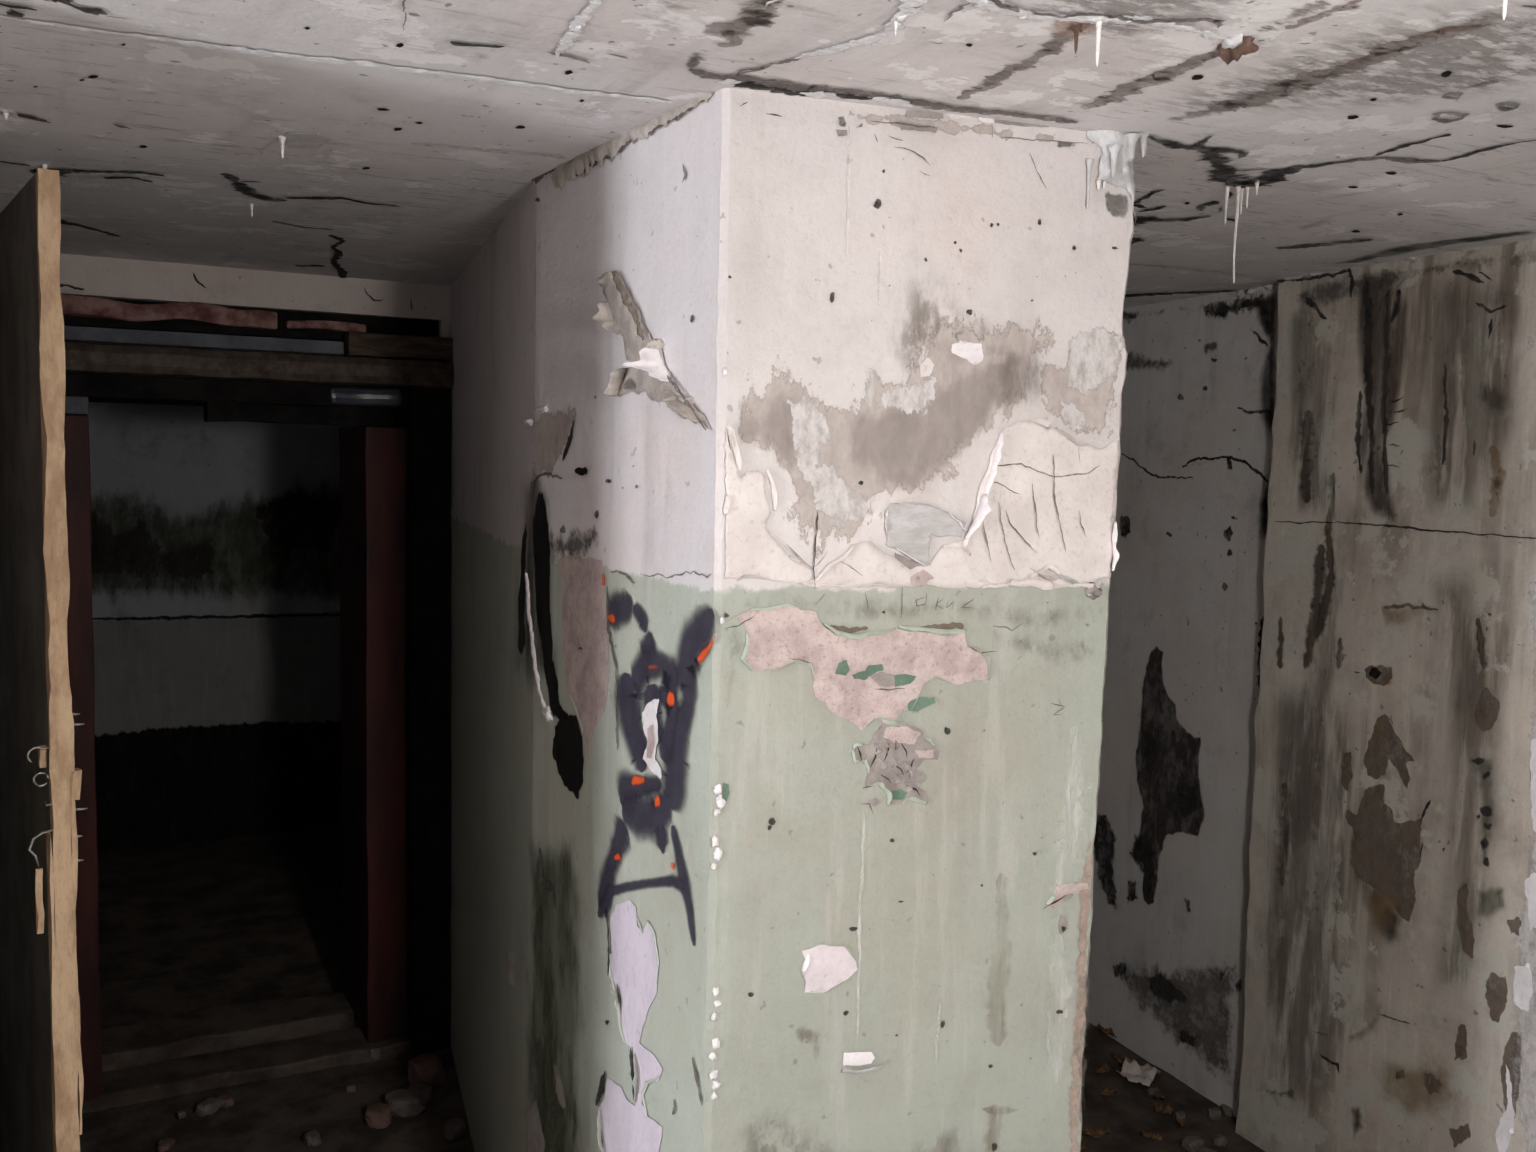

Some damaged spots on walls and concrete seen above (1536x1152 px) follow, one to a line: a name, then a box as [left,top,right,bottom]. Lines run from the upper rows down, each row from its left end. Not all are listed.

flaking render [592,270,1125,590]
peeling [642,699,662,779]
peeling [719,603,996,815]
spalling [711,783,730,870]
spalling [709,987,722,1100]